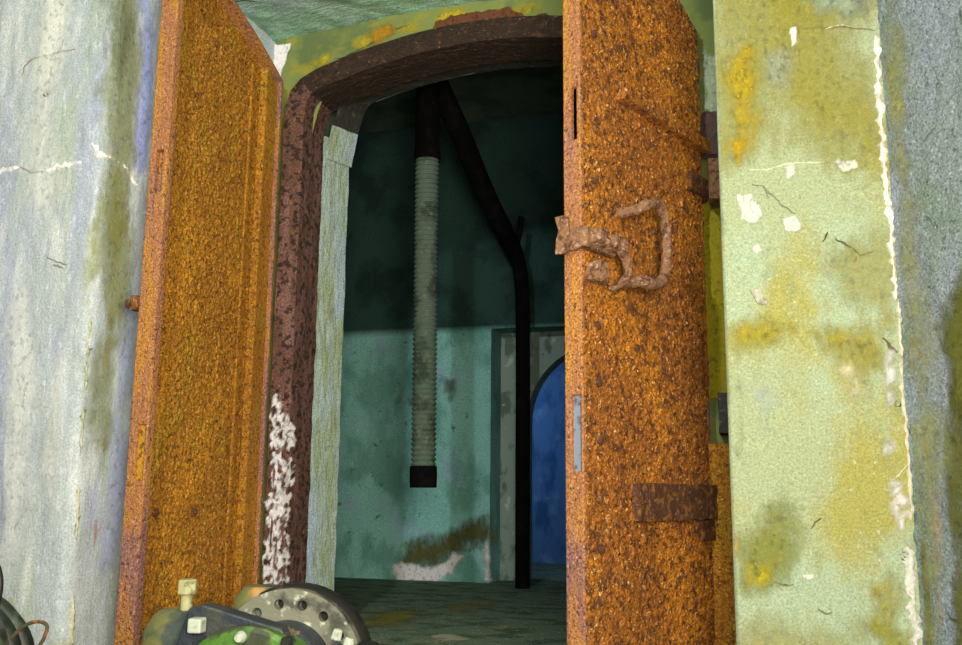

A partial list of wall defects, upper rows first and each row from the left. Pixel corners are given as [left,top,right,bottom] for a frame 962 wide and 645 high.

corrosion [433,6,524,29]
crack [0,143,138,186]
peeling [746,160,858,179]
peeling [737,193,762,223]
peeling [783,216,801,232]
peeling [873,35,914,530]
leakage [944,383,962,645]
peeling [900,546,923,645]